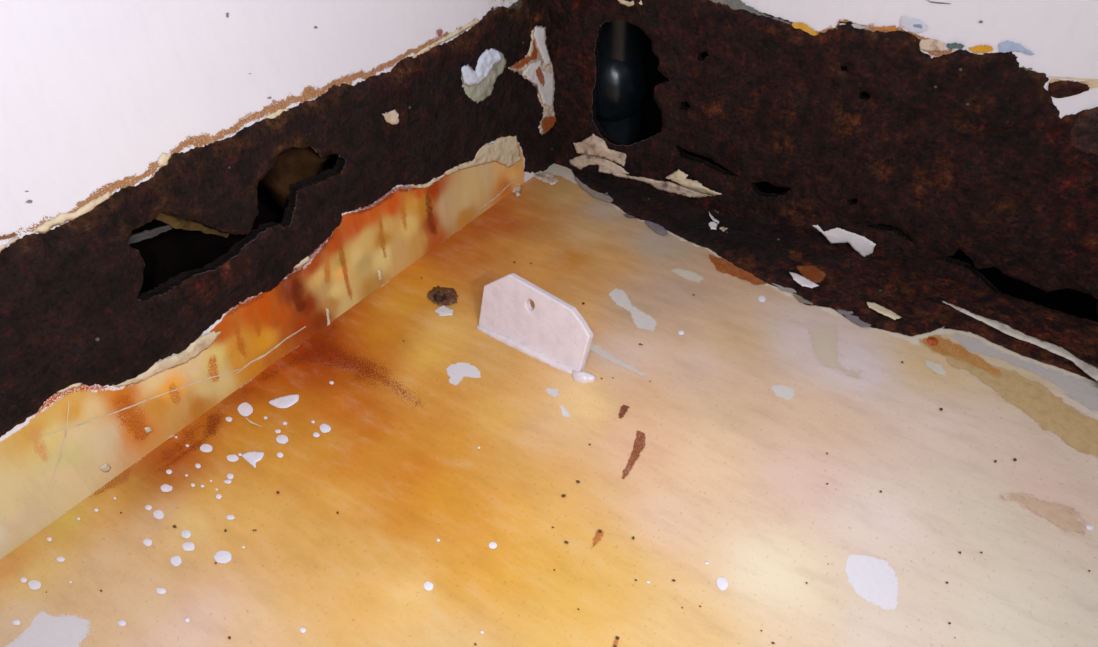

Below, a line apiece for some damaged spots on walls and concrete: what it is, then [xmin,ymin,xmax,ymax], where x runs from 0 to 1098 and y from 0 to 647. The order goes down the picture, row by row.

peeling [157,152,172,167]
corrosion [0,0,556,560]
peeling [522,27,554,107]
corrosion [0,169,1098,647]
corrosion [549,0,1098,313]